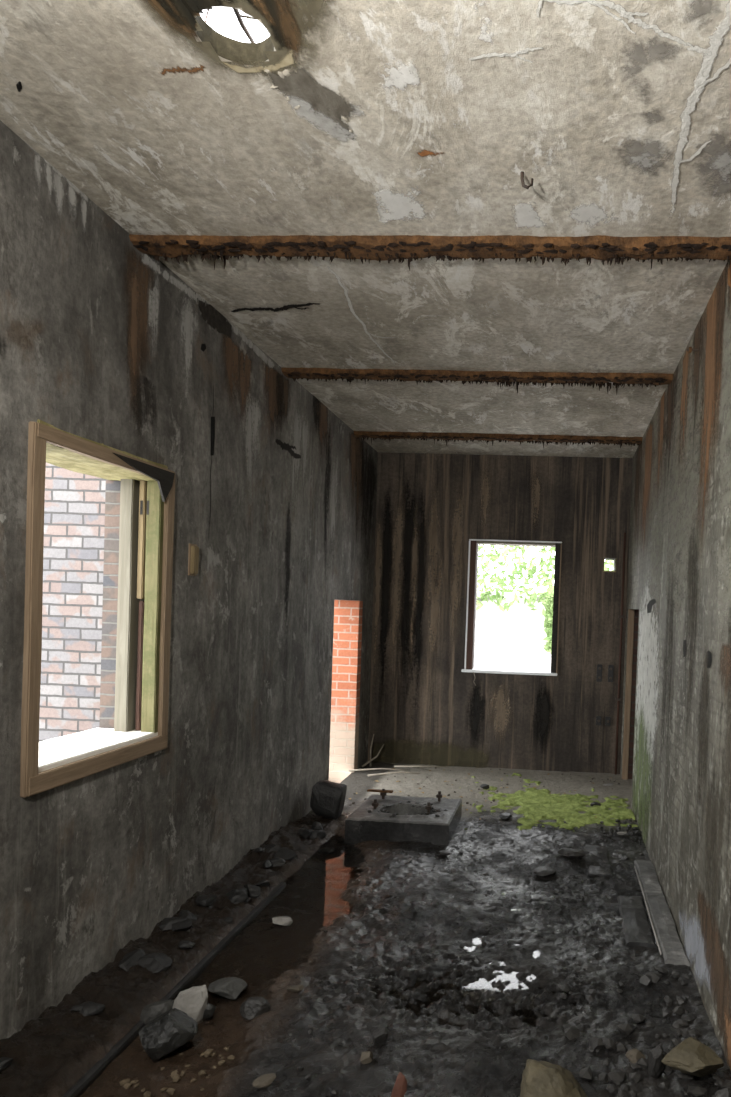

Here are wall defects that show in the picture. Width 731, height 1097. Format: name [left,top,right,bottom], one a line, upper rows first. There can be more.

damp [688,0,717,24]
damp [625,37,677,77]
spalling [261,68,364,141]
crack [536,0,731,213]
damp [618,140,670,175]
damp [697,134,731,197]
crack [231,303,320,312]
damp [361,449,463,695]
damp [467,685,510,744]
damp [533,688,553,749]
damp [663,539,731,928]